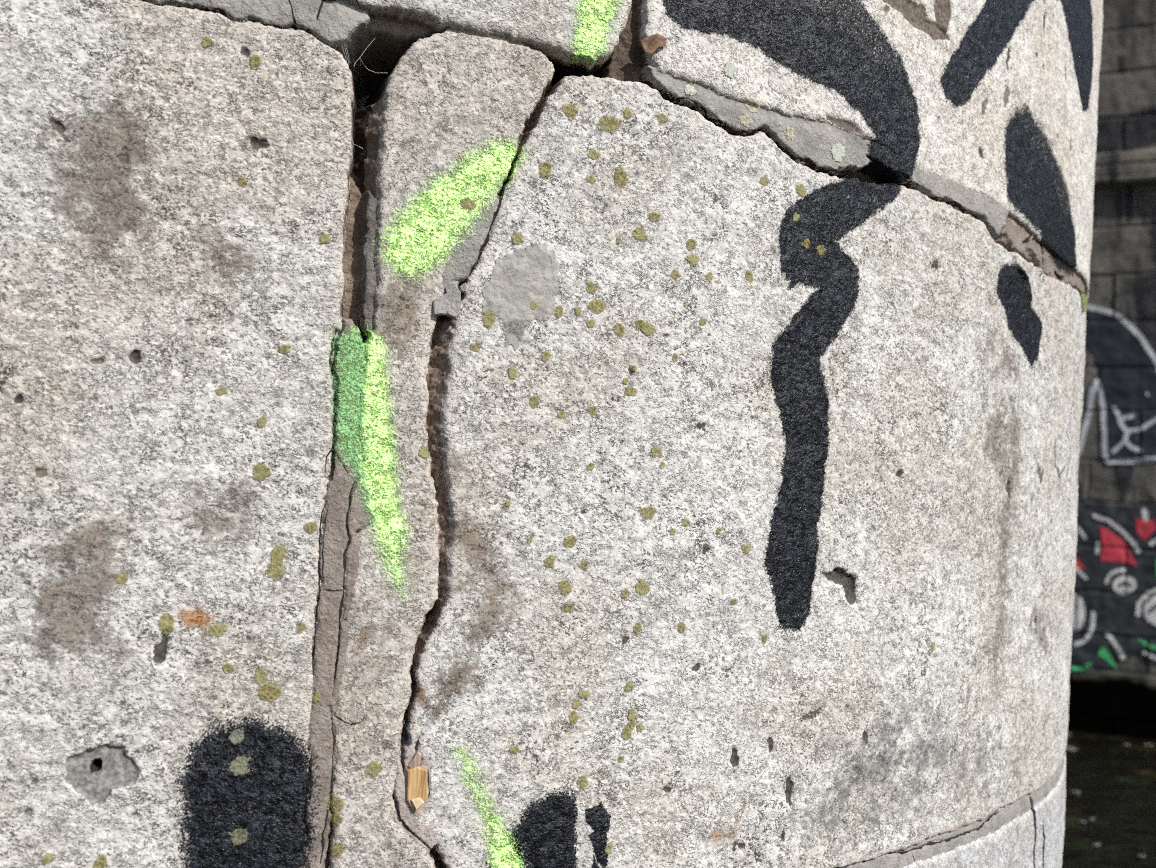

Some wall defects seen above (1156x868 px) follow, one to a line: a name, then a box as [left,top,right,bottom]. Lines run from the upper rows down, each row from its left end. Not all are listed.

spalling [882,0,951,40]
crack [641,81,992,237]
crack [1022,233,1062,281]
crack [393,77,564,868]
corrosion [180,610,208,627]
crack [301,331,364,864]
spalling [822,568,857,604]
crack [835,807,1005,868]